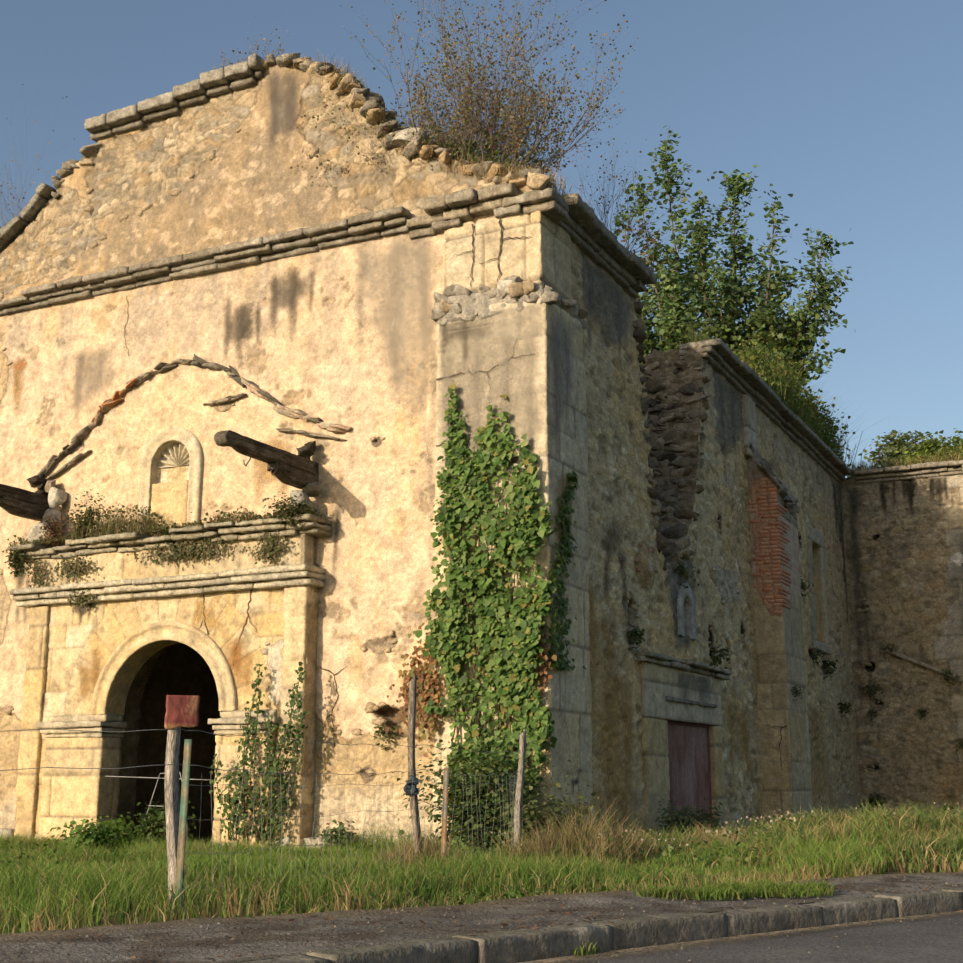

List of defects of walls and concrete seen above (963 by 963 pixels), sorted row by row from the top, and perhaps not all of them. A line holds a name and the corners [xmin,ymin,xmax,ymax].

crack [452,218,530,286]
leakage [226,308,259,344]
leakage [272,274,312,318]
crack [436,338,535,388]
flaking render [748,477,802,616]
crack [320,665,348,747]
flaking render [0,705,22,829]